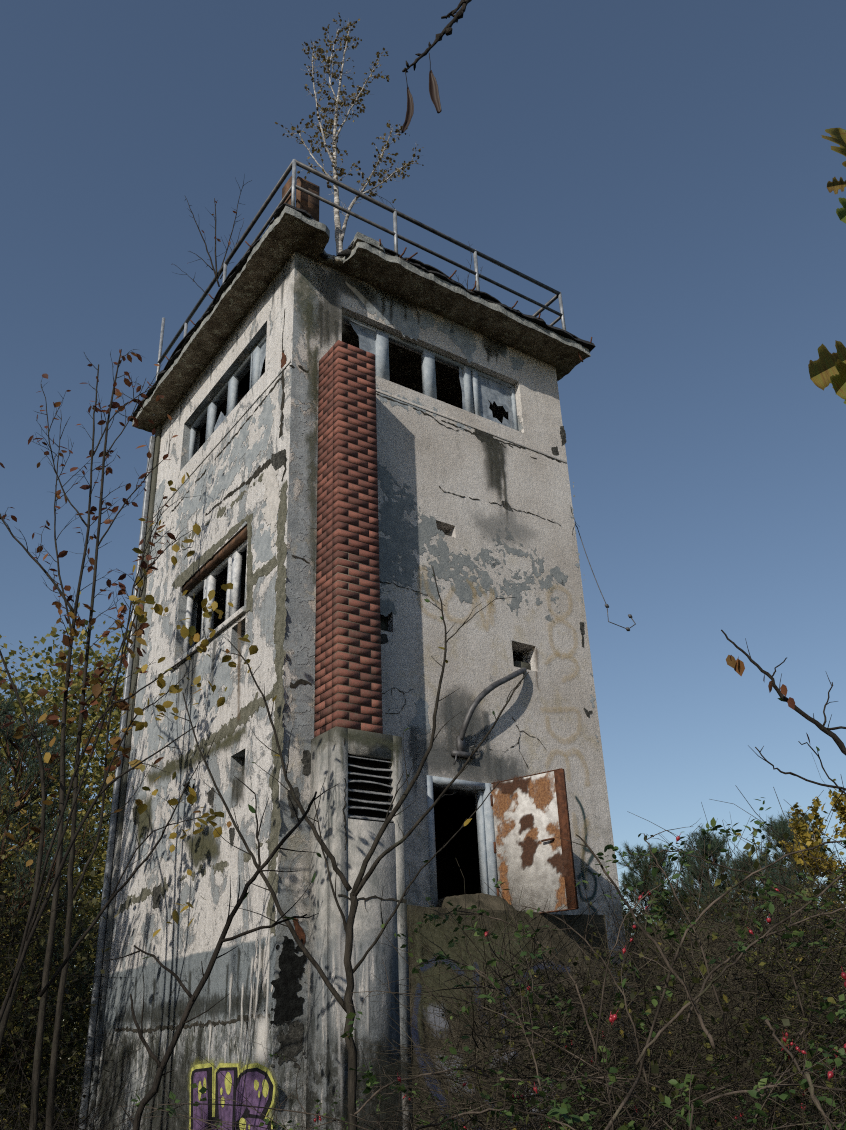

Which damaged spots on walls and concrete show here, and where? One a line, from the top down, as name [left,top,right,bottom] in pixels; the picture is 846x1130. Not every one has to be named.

crack [376,393,561,462]
peeling [377,461,586,622]
water stain [482,437,507,508]
crack [439,486,580,535]
peeling [127,361,317,909]
rust [491,772,571,909]
water stain [116,919,270,1092]
spalling [252,918,307,1070]
water stain [337,923,369,1100]